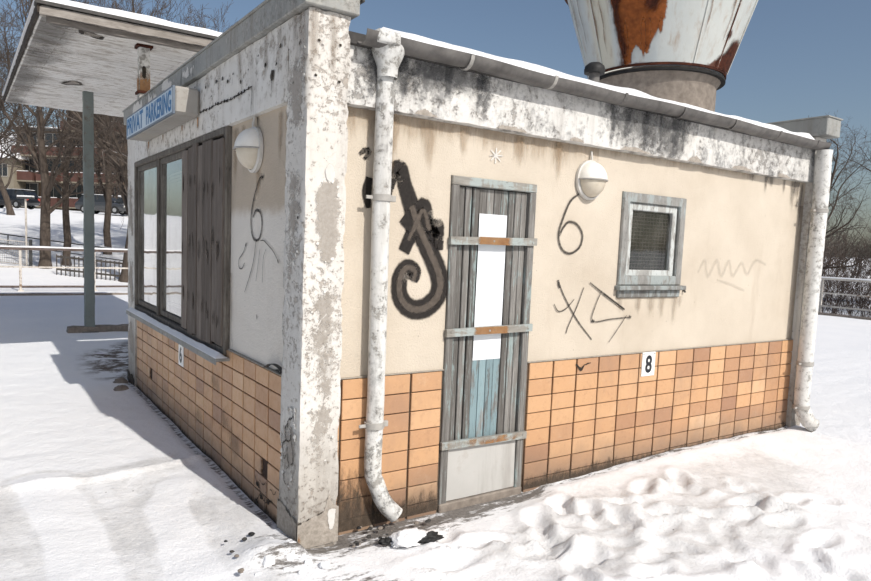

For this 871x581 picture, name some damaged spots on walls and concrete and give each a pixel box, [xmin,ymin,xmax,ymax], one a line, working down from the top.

rust [137,66,150,91]
rust [590,0,667,66]
rust [715,31,739,75]
leakage [611,104,686,158]
peeling [280,287,339,487]
spalling [260,457,269,477]
spalling [277,495,339,549]